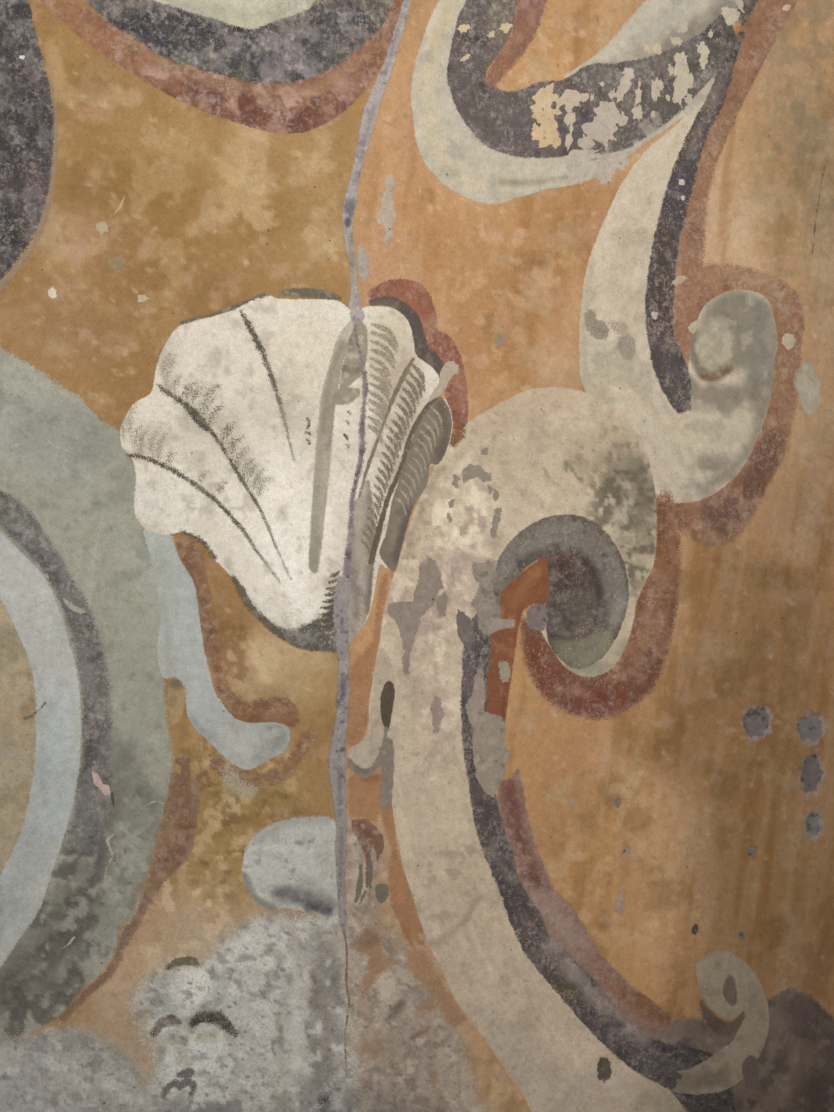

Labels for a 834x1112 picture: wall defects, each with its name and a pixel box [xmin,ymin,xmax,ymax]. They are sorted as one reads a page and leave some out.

peeling [486,23,513,40]
peeling [530,17,713,185]
peeling [721,0,745,26]
crack [327,0,411,1075]